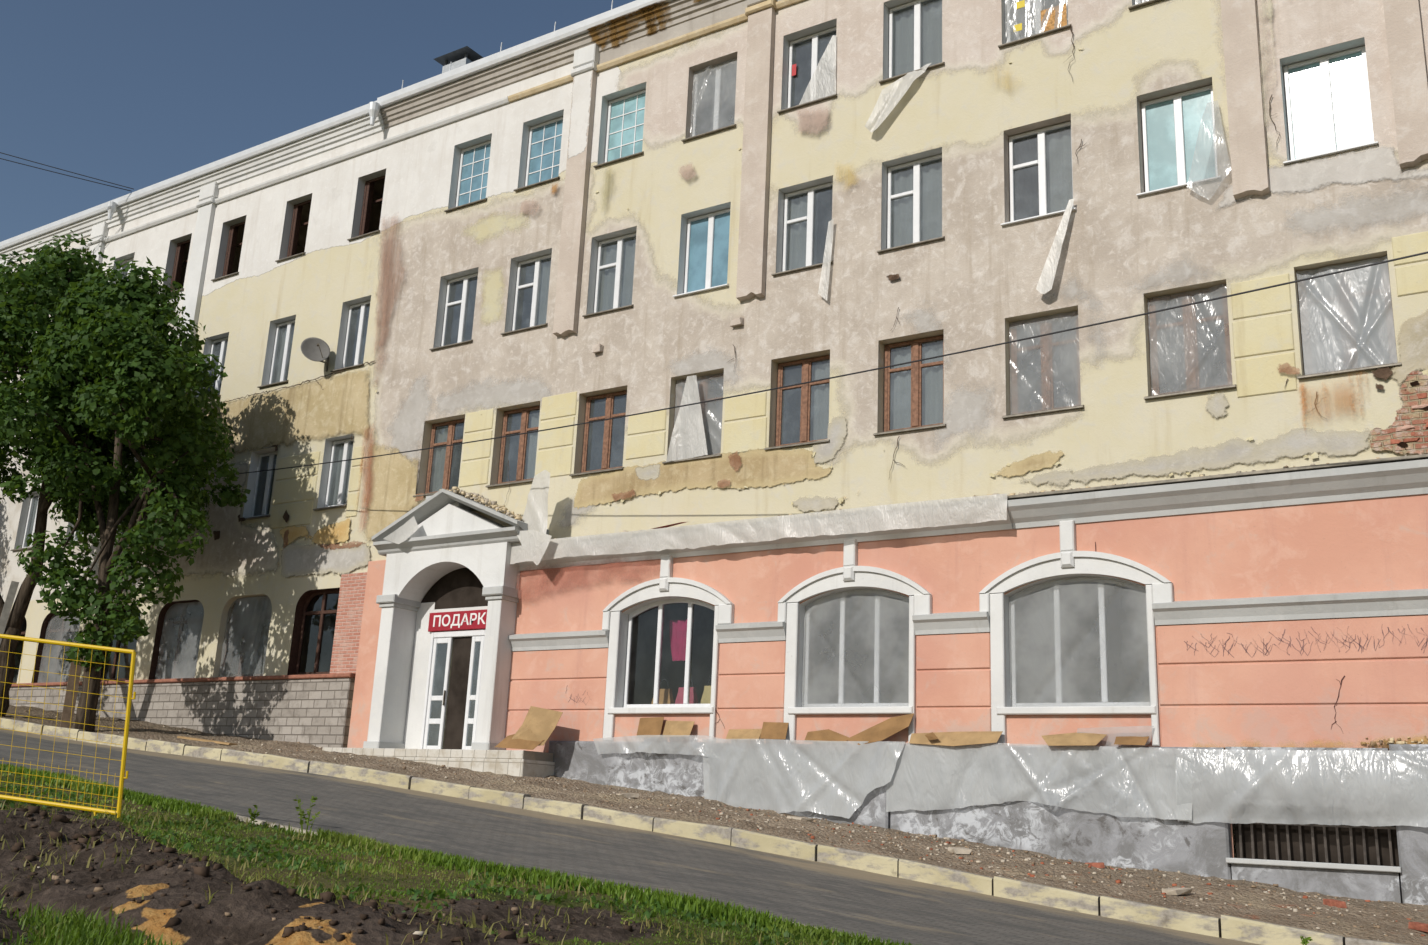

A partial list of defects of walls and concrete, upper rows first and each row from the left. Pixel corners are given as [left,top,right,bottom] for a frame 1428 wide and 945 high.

peeling [142,0,1428,586]
crack [1331,676,1345,732]